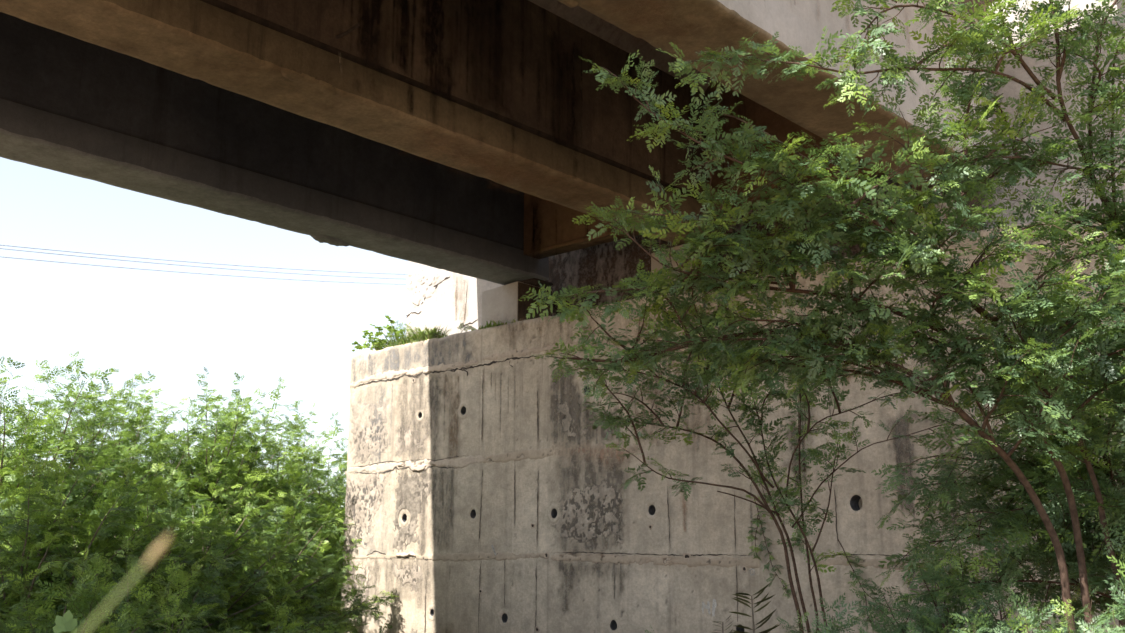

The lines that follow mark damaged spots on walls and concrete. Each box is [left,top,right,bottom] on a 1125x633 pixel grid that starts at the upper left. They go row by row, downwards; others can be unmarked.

water stain [343,0,507,109]
water stain [354,335,472,545]
water stain [550,369,625,611]